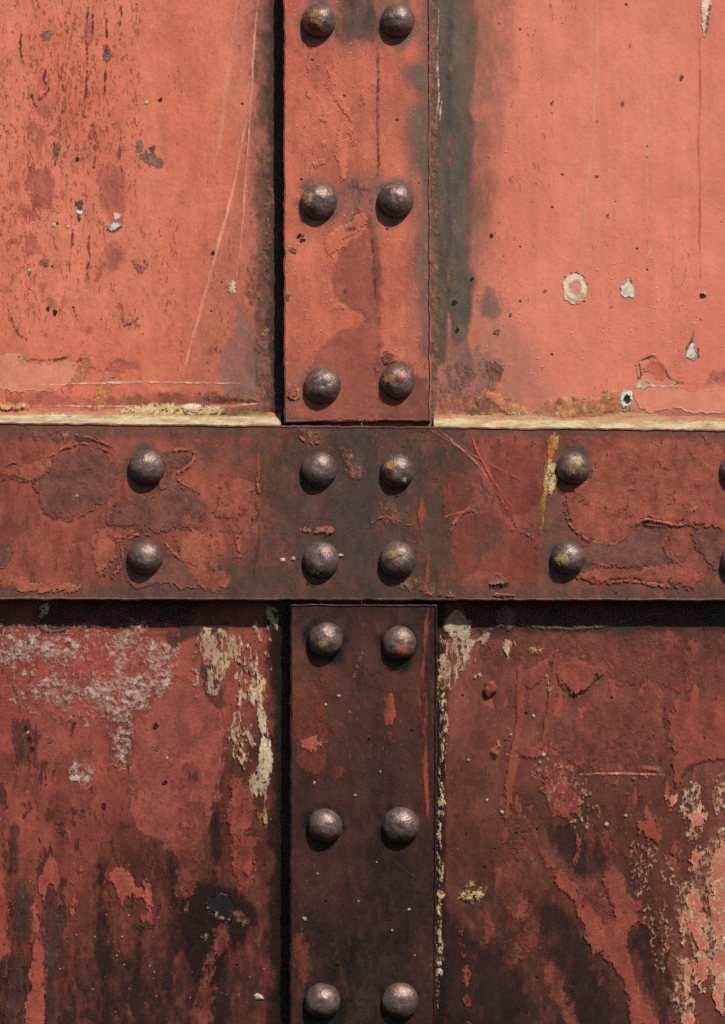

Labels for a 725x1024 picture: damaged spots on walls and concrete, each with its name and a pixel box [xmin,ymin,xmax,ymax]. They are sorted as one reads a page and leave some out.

water stain [444,0,505,360]
corrosion [430,0,620,424]
peeling [562,271,588,304]
peeling [619,355,725,414]
peeling [0,542,81,595]
peeling [0,429,121,523]
peeling [89,476,254,592]
peeling [562,433,725,592]
peeling [68,610,229,675]
peeling [0,682,72,767]
peeling [125,677,260,1024]
peeling [479,690,725,1024]